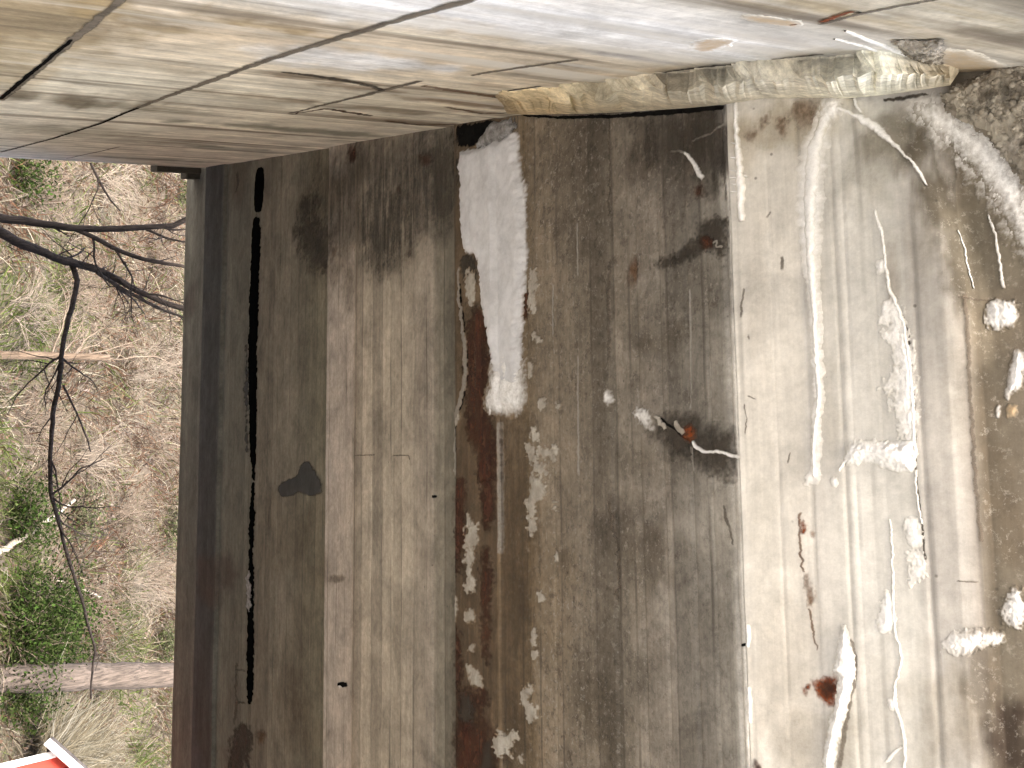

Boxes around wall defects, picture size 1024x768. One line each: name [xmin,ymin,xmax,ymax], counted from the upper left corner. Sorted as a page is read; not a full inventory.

crack [282,72,385,91]
spalling [891,39,947,65]
damp [901,90,1024,266]
rust [658,217,729,268]
damp [292,117,531,554]
damp [793,98,919,488]
damp [983,297,1021,332]
rust [453,310,526,768]
damp [940,582,1024,657]
rust [803,677,837,706]
damp [821,625,857,768]